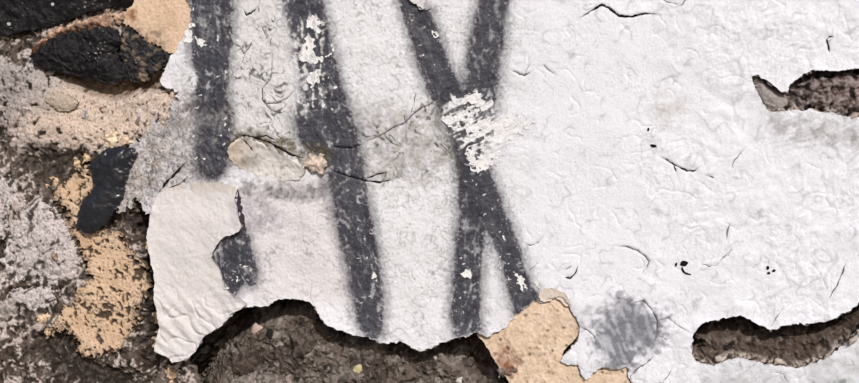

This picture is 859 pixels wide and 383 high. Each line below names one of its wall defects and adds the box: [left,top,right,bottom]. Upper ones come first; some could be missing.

crack [334,91,445,149]
spalling [752,68,859,119]
spalling [0,0,632,383]
crack [328,168,389,183]
spalling [691,303,859,368]